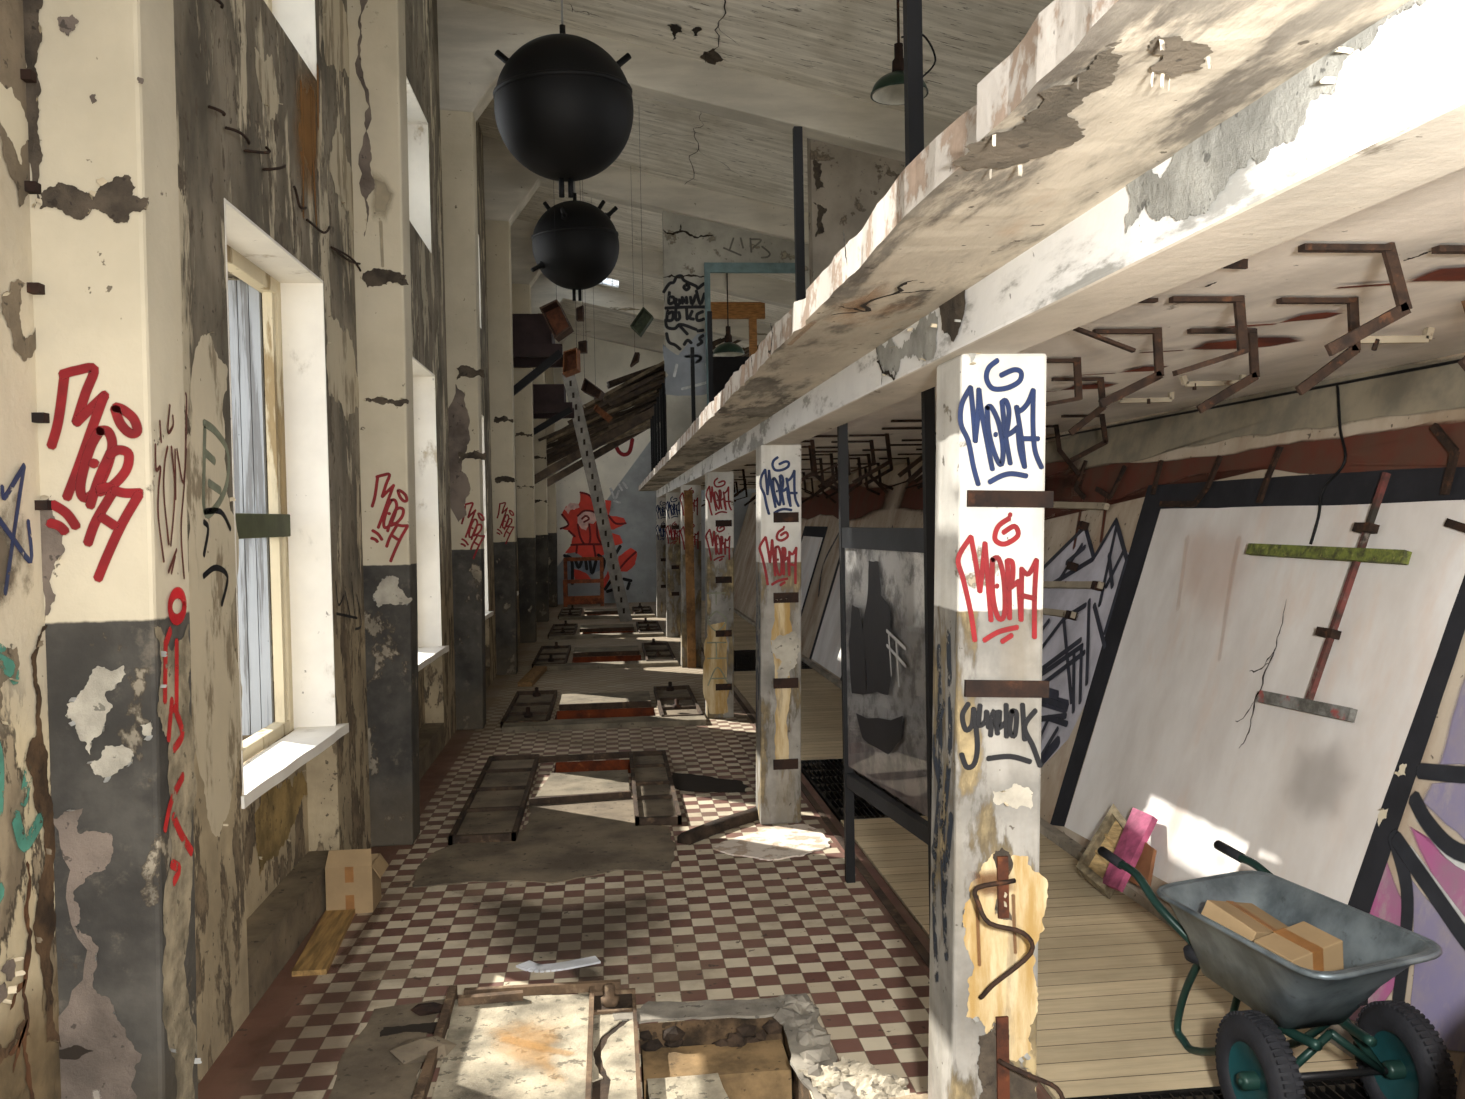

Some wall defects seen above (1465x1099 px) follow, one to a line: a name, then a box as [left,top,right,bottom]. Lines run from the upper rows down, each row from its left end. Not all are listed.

peeling [0,0,149,223]
spalling [355,0,375,236]
crack [705,0,740,62]
peeling [1125,0,1427,235]
peeling [1,279,36,362]
spalling [360,268,409,288]
peeling [373,576,412,607]
crack [1236,603,1286,748]
peeling [0,495,142,1099]
peeling [65,624,202,1099]
rust [976,874,1017,966]
peeling [962,848,1048,1099]